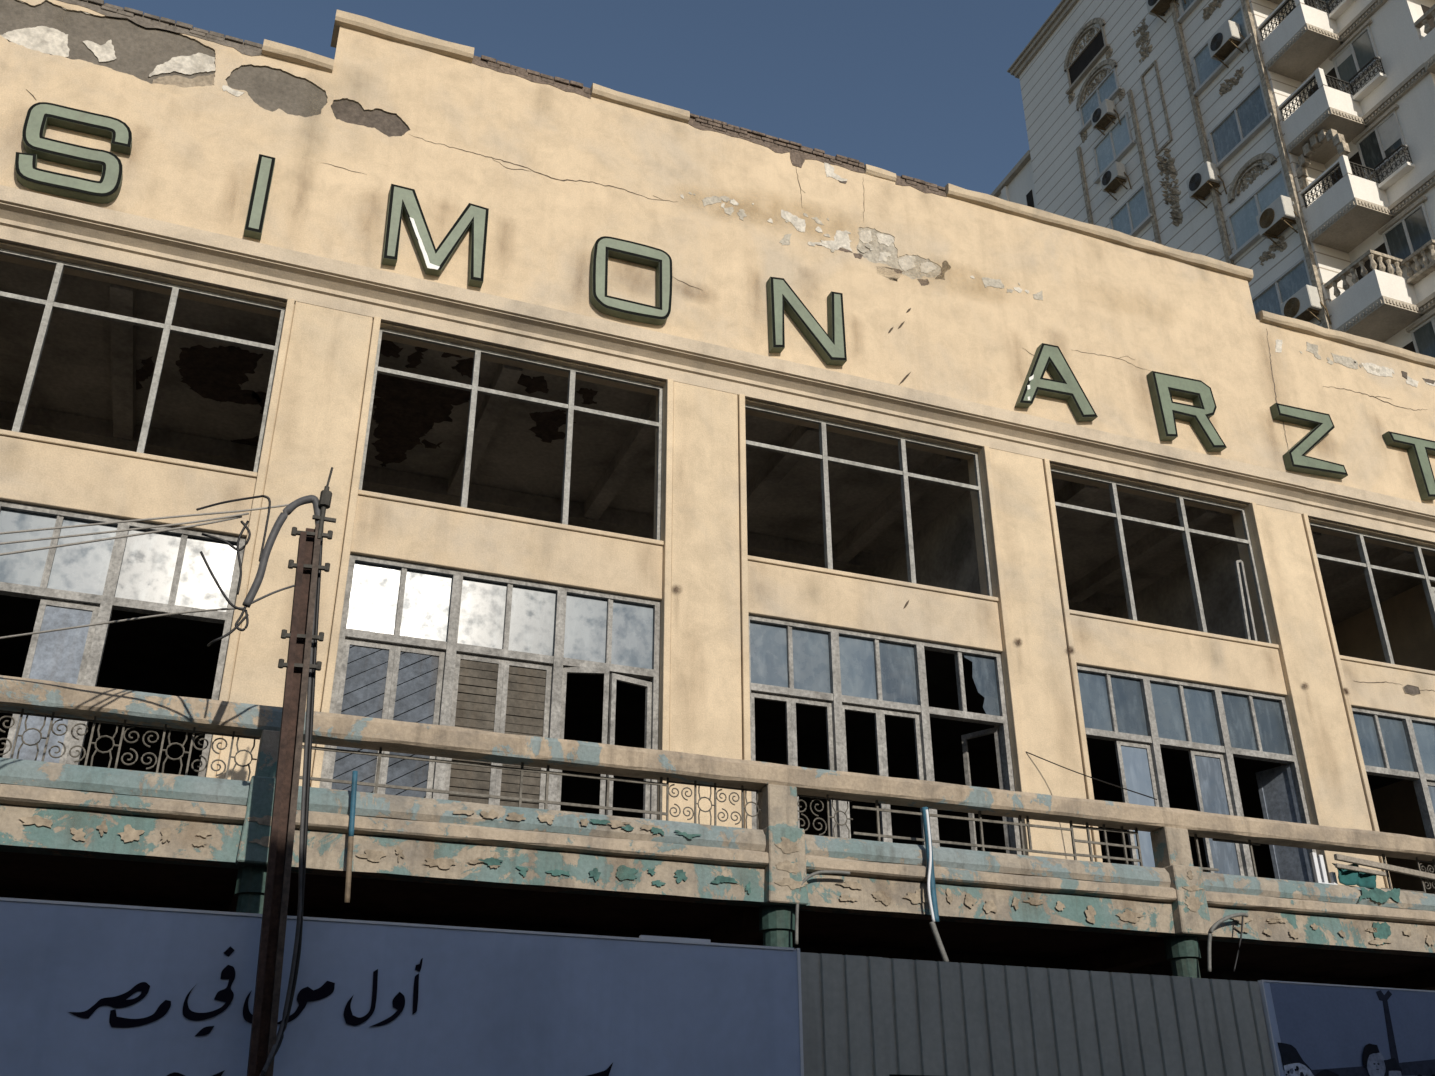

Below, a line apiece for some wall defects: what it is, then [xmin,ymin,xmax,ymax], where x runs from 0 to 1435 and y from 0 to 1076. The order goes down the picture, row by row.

spalling [0,0,409,137]
crack [414,136,678,202]
flaking render [680,192,754,220]
spalling [767,210,951,286]
peeling [70,820,171,843]
peeling [453,809,555,825]
peeling [580,818,701,839]
peeling [589,865,688,887]
peeling [711,875,751,894]
peeling [1358,887,1400,904]
peeling [1366,922,1434,946]